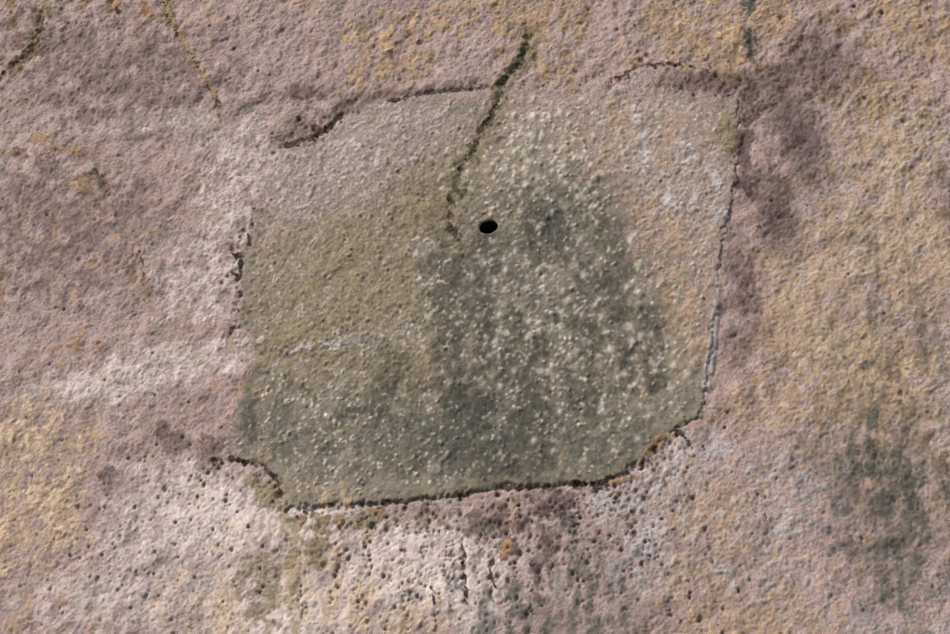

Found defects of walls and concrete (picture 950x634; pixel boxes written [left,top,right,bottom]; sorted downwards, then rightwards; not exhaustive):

crack [282,99,354,148]
water stain [80,0,593,324]
crack [386,42,532,247]
crack [231,224,253,311]
water stain [538,0,950,634]
water stain [0,335,252,577]
peeling [244,472,280,508]
water stain [93,453,546,634]
peeling [298,505,387,570]
spalling [461,487,592,560]
crack [503,419,686,493]
peeling [596,474,811,597]